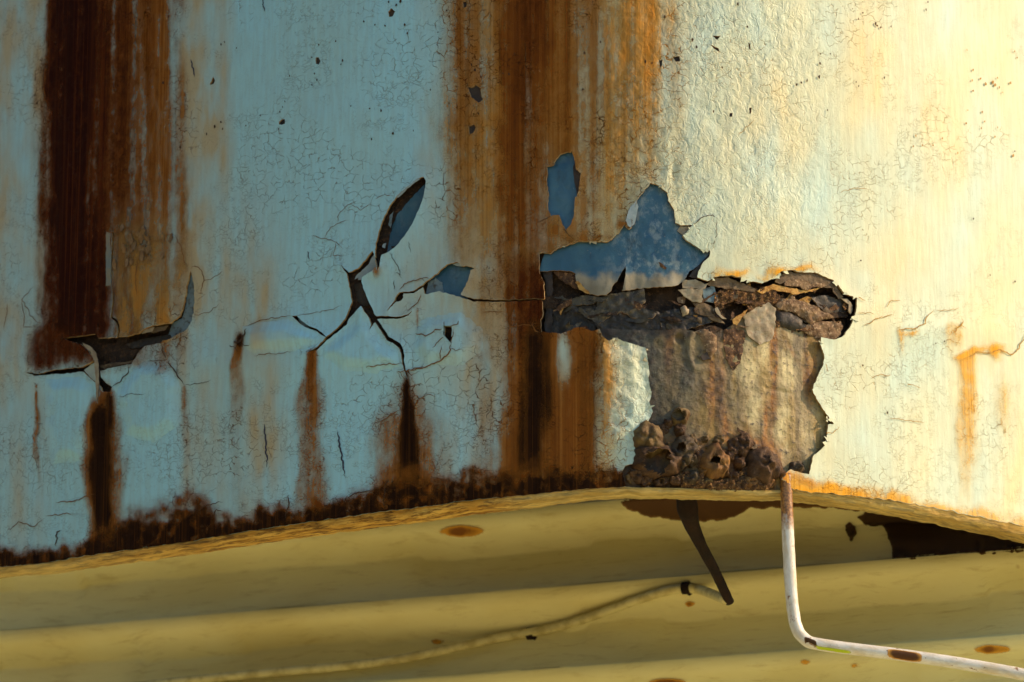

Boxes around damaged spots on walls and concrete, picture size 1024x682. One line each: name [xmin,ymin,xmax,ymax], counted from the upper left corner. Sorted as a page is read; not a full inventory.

rust [26,0,189,466]
peeling [377,178,426,254]
rust [437,0,682,498]
peeling [547,152,581,230]
rust [79,387,129,539]
peeling [29,275,195,404]
rust [295,349,327,509]
rust [372,369,452,486]
rust [440,526,483,537]
spalling [385,184,1024,560]
rust [783,470,1000,521]
rust [946,330,1003,464]